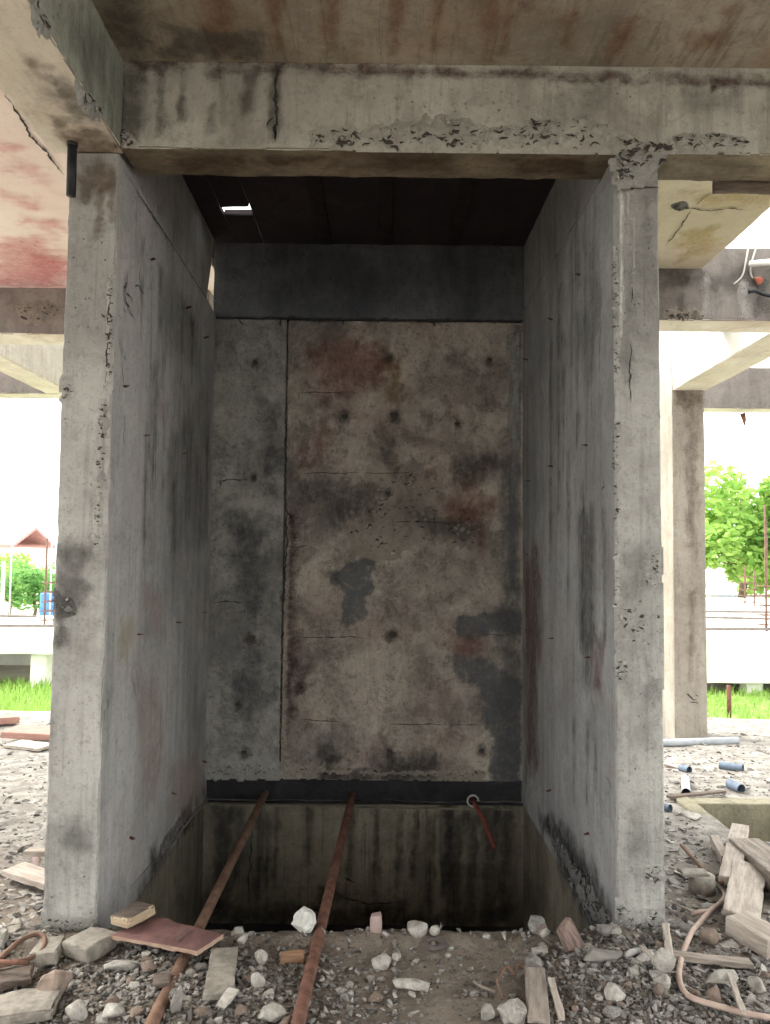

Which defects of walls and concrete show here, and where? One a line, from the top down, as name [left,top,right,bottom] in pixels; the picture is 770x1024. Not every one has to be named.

crack [5,95,63,174]
crack [267,65,279,142]
spalling [308,111,750,190]
crack [668,194,742,242]
crack [626,348,634,399]
water stain [207,781,512,927]
water stain [540,817,607,912]